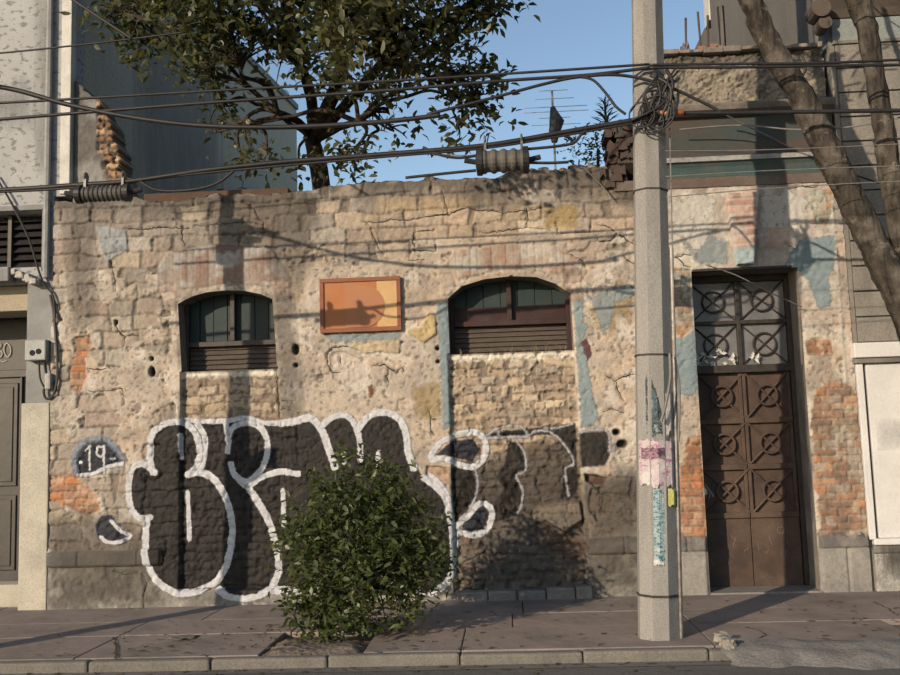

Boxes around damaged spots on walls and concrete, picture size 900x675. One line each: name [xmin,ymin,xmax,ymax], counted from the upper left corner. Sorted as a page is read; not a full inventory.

crack [363,190,550,261]
peeling [759,188,836,308]
spalling [70,335,93,393]
crack [88,368,125,405]
flaking render [806,337,833,356]
spalling [49,474,100,515]
flaking render [680,435,707,538]
flaking render [810,377,868,537]